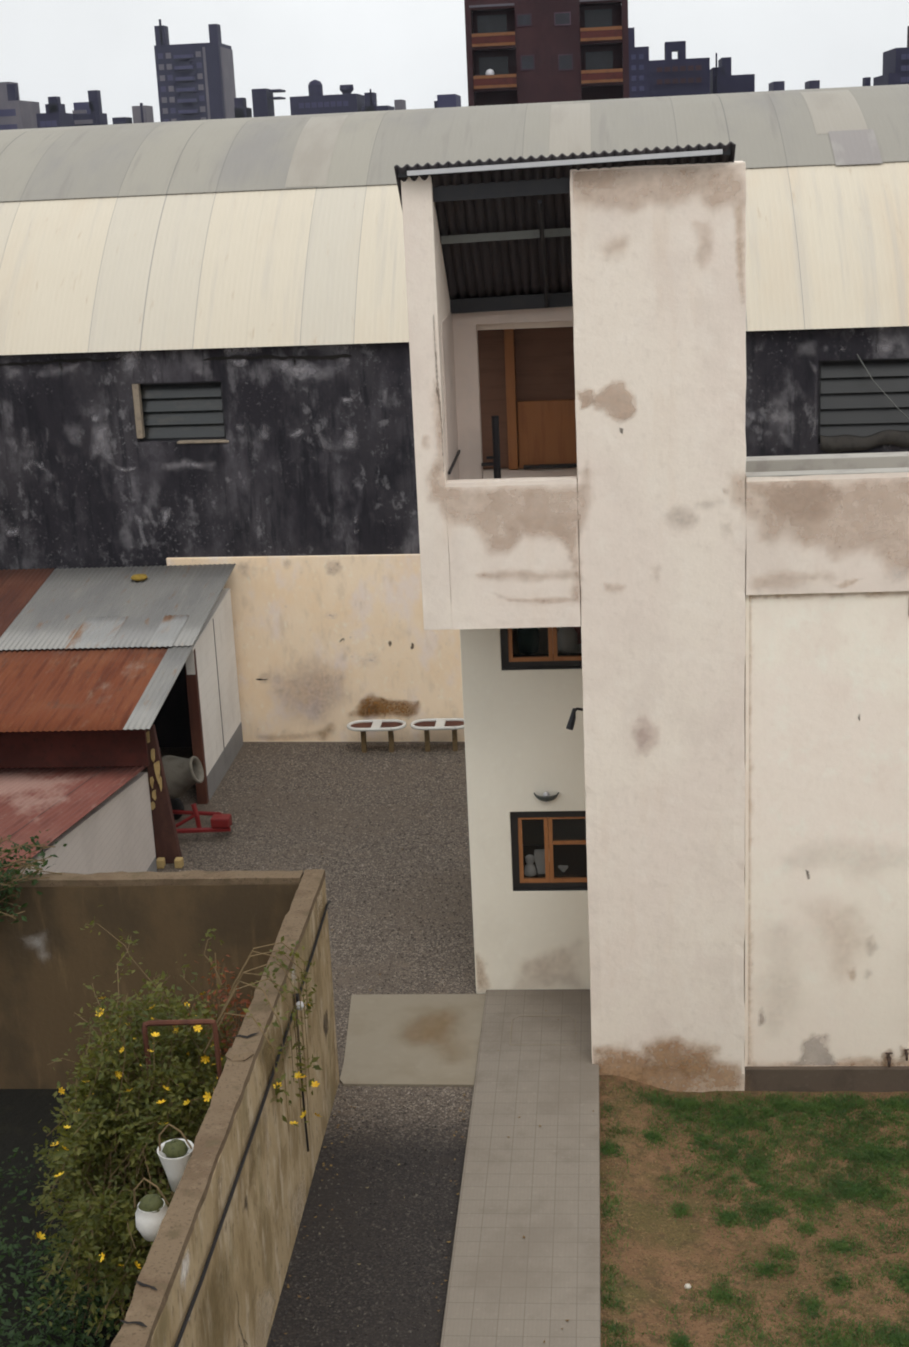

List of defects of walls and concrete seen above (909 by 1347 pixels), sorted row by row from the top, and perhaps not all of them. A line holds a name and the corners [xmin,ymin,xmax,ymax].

leakage [281,362,322,376]
leakage [484,490,579,551]
leakage [596,1041,740,1092]